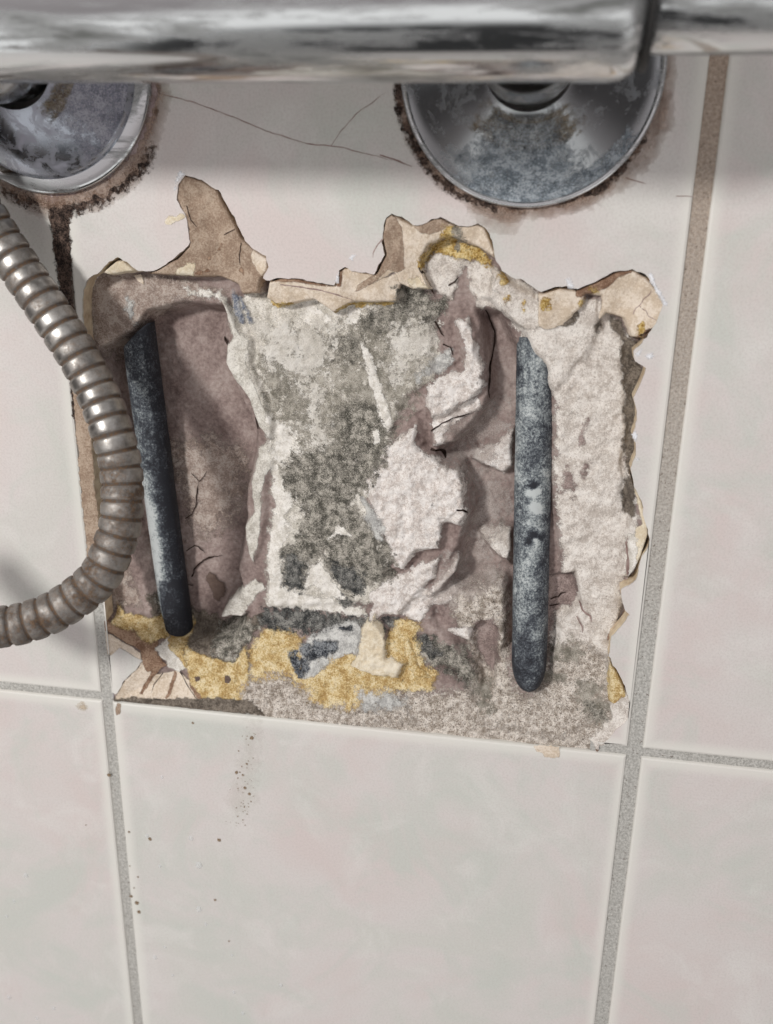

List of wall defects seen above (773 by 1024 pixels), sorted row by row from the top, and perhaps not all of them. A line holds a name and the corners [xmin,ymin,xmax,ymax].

crack [162,93,411,167]
leakage [48,207,76,312]
leakage [70,388,99,557]
leakage [232,285,444,638]
spalling [92,171,668,758]